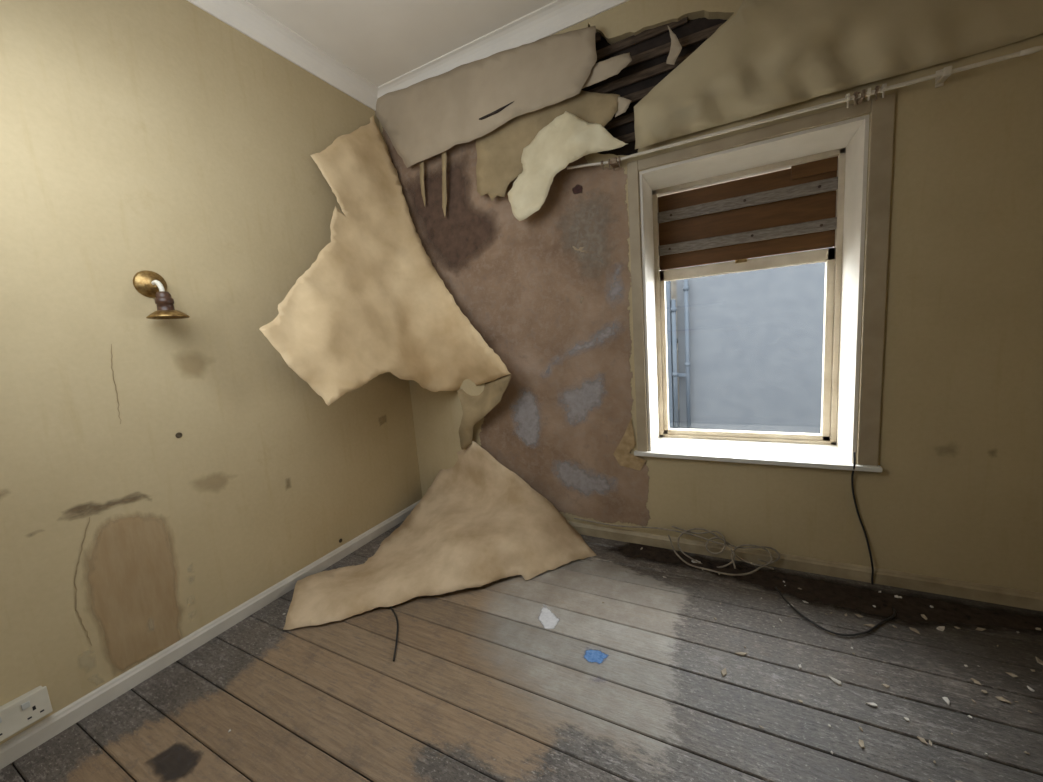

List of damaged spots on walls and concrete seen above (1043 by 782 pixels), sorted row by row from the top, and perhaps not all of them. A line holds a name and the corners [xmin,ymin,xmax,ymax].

flaking render [382,17,727,526]
peeling [74,516,180,671]